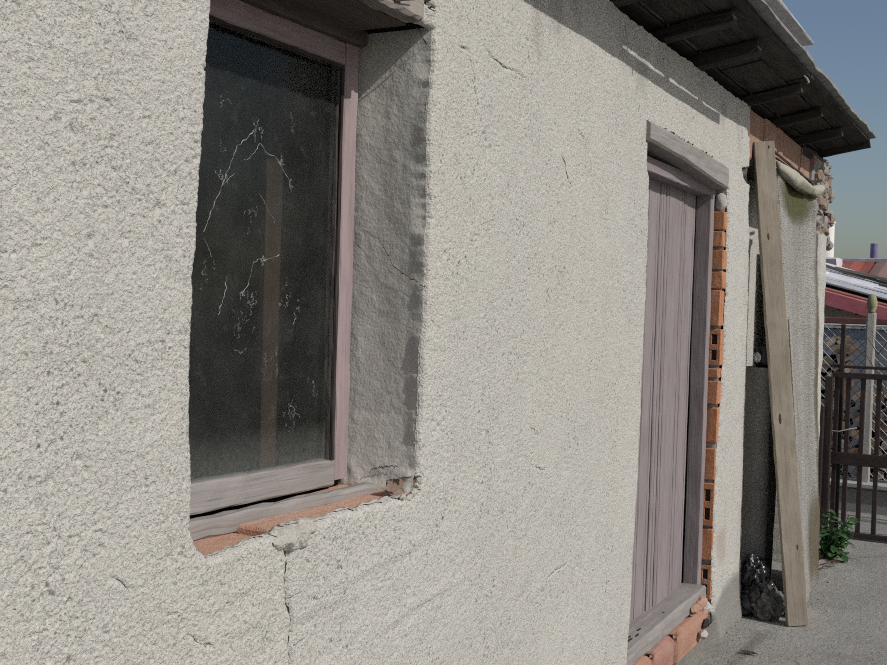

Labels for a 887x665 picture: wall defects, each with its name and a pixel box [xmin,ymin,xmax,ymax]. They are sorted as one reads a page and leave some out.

crack [365,230,427,288]
spalling [386,477,419,501]
crack [269,534,304,652]